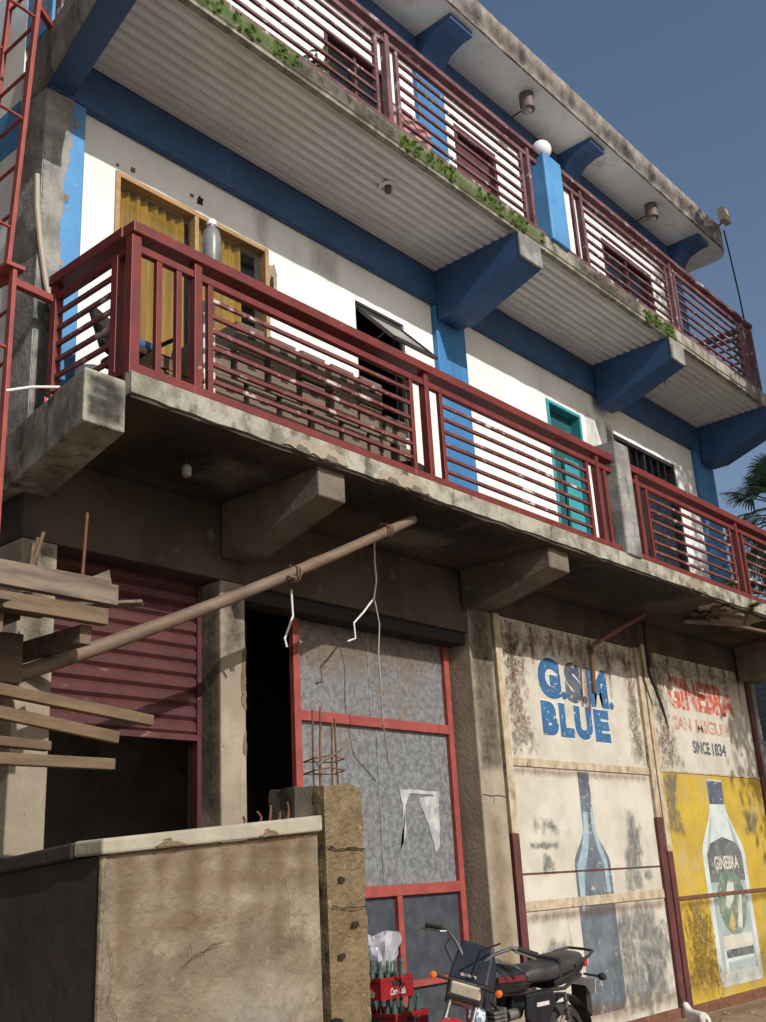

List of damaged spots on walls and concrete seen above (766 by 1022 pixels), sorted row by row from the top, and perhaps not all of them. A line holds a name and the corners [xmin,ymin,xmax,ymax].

flaking render [7,86,80,435]
water stain [90,377,120,419]
spalling [155,837,188,848]
crack [184,942,222,965]